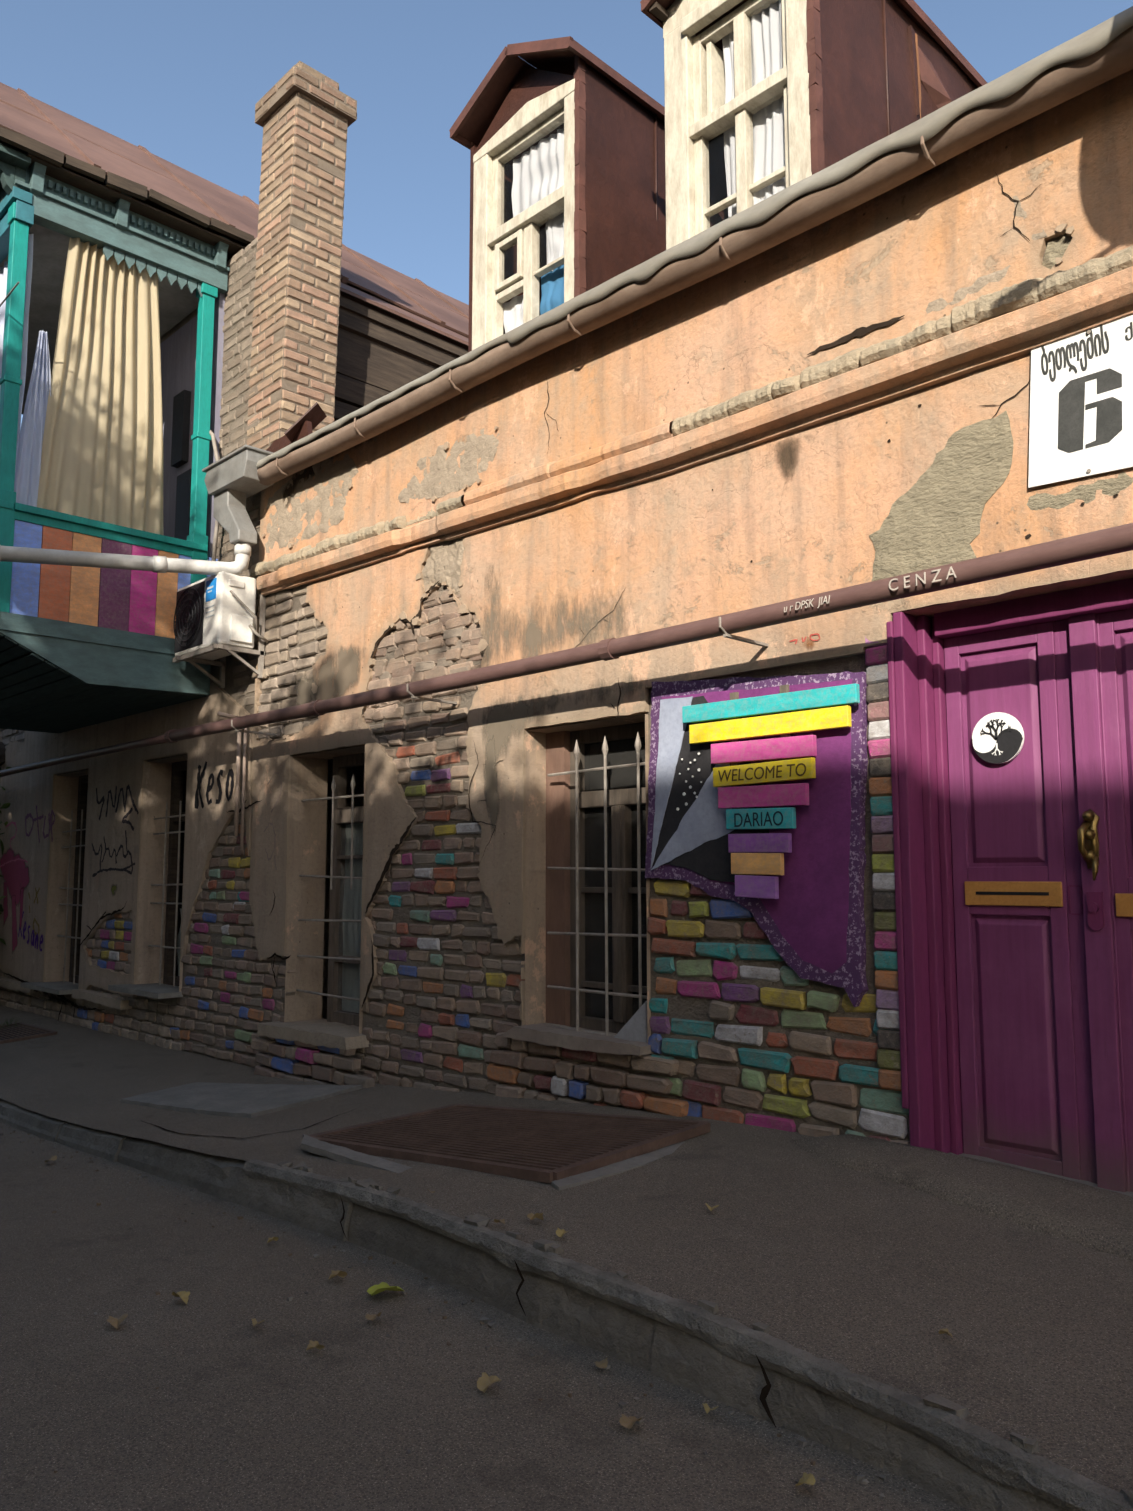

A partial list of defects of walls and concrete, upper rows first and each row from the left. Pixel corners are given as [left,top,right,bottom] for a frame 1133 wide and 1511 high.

crack [995,172,1040,241]
spalling [1012,184,1075,269]
spalling [248,583,328,740]
spalling [365,537,488,720]
crack [756,1355,776,1427]